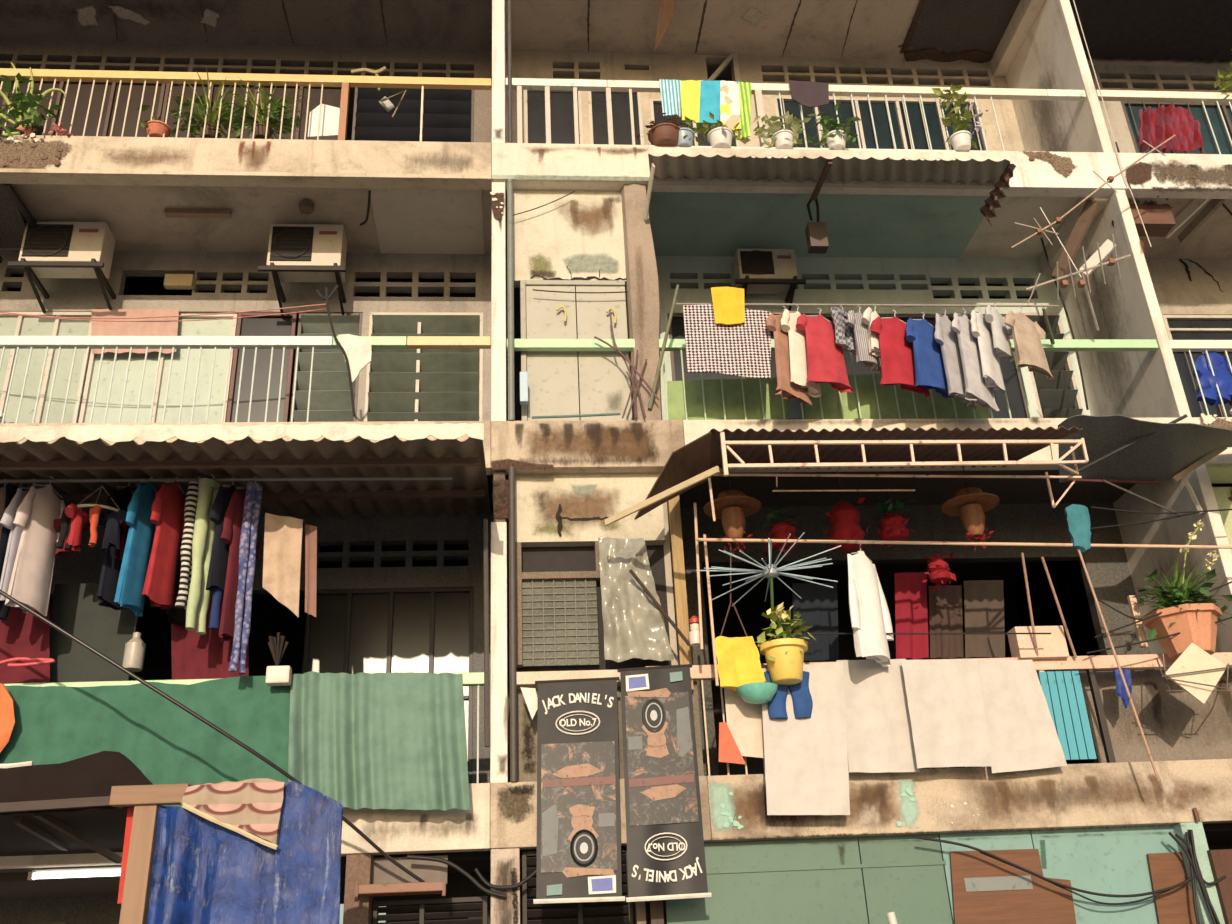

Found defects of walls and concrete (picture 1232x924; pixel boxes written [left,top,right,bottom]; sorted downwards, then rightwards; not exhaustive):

crack [782,0,802,57]
crack [841,0,858,58]
spalling [0,133,70,169]
corrosion [239,141,271,168]
spalling [1023,151,1075,178]
water stain [1152,161,1232,192]
water stain [571,198,618,232]
crack [1179,259,1223,292]
water stain [515,423,655,463]
water stain [537,485,615,532]
crack [555,504,609,537]
water stain [1071,776,1198,808]